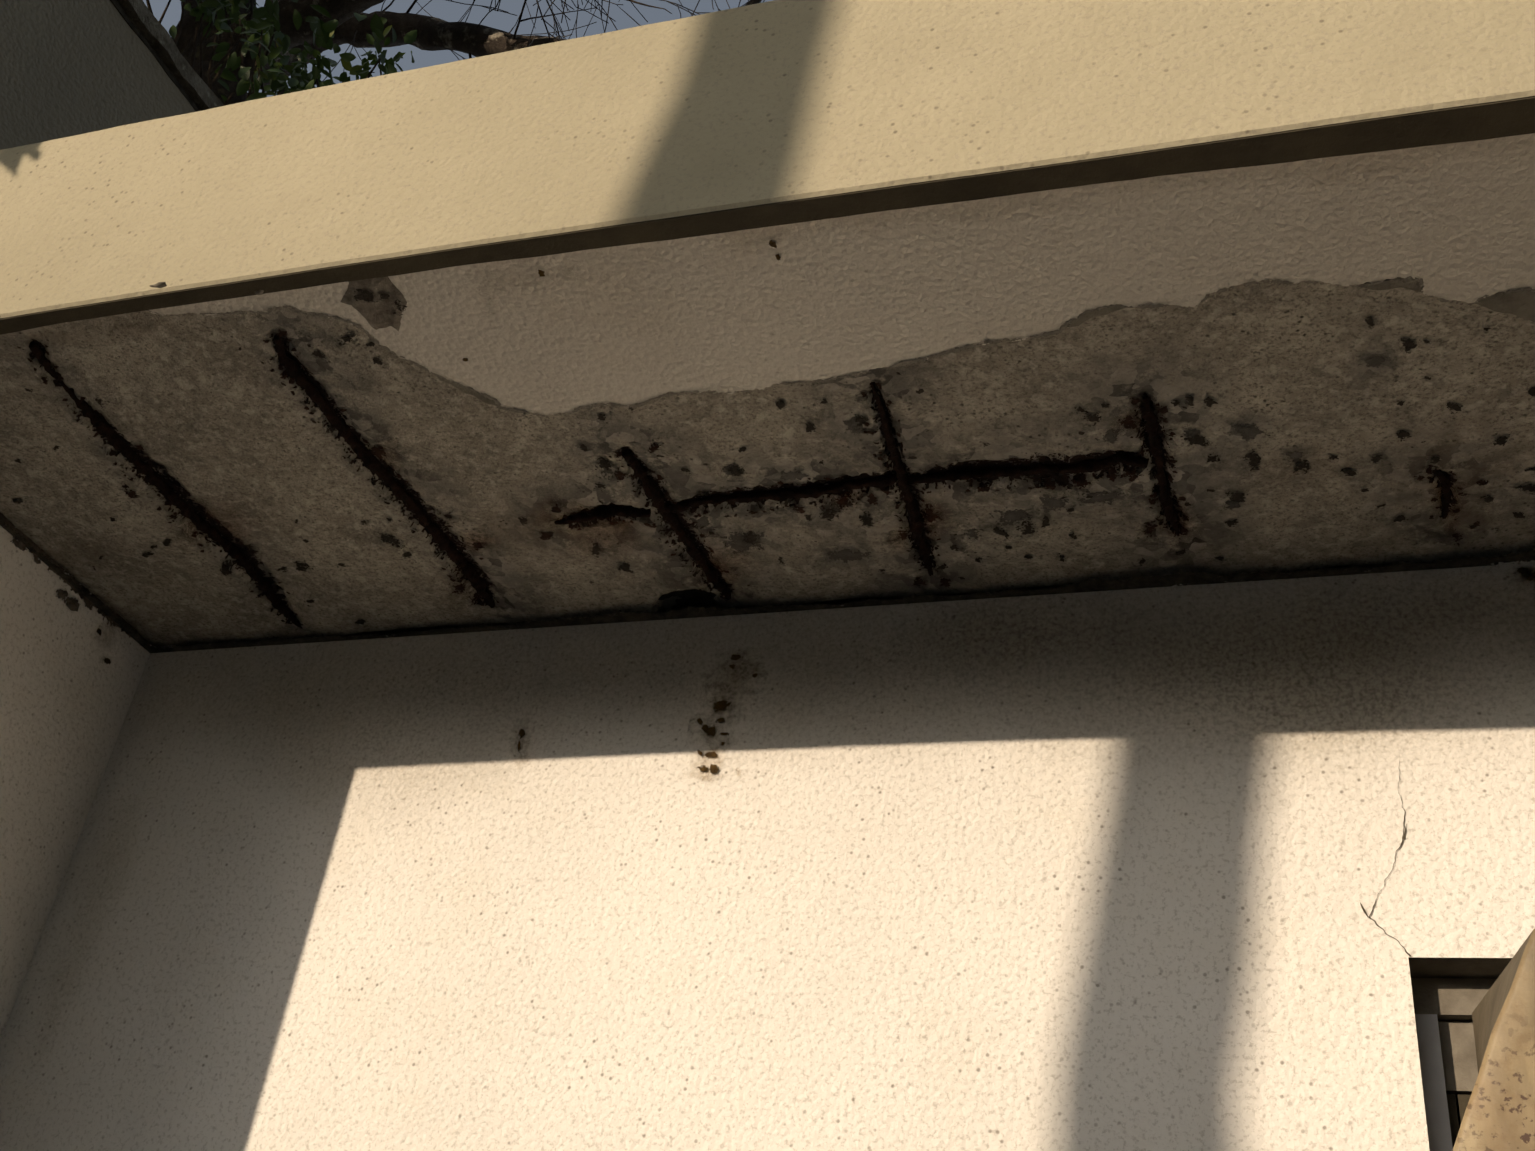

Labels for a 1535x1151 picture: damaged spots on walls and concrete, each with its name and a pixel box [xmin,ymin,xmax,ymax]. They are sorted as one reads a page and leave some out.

crack [1527,387,1535,396]
spalling [0,276,1535,647]
crack [0,521,1535,653]
corrosion [697,700,731,774]
crack [1360,761,1411,956]